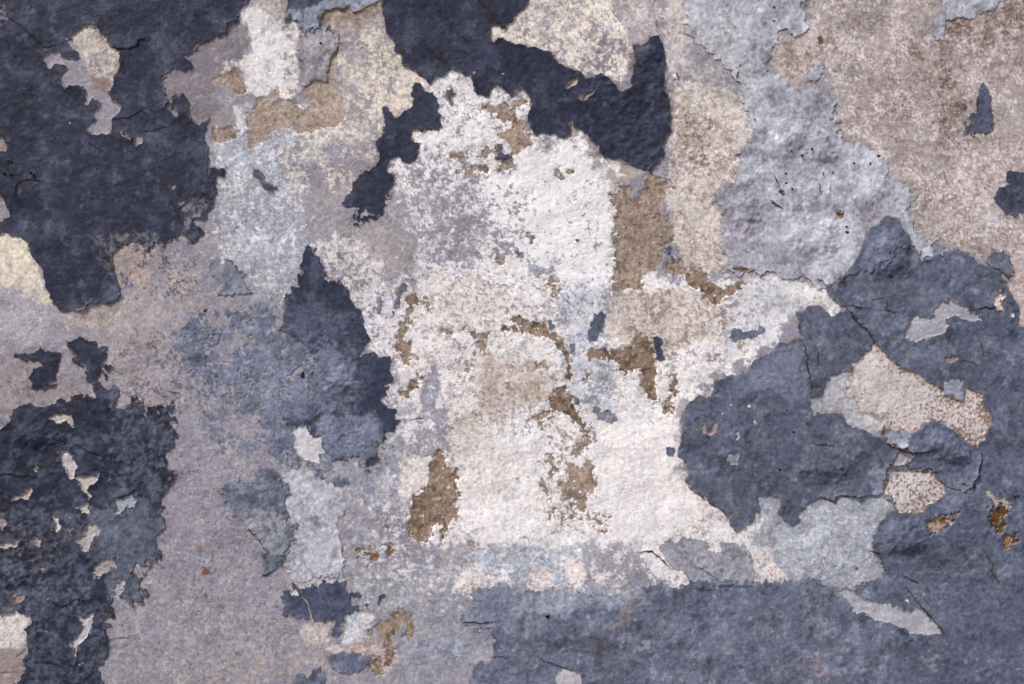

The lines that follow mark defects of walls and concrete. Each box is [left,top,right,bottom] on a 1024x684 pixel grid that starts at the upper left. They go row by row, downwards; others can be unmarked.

peeling [0,0,248,312]
peeling [0,336,178,684]
peeling [171,245,431,638]
peeling [248,0,1024,684]
crack [872,550,943,631]